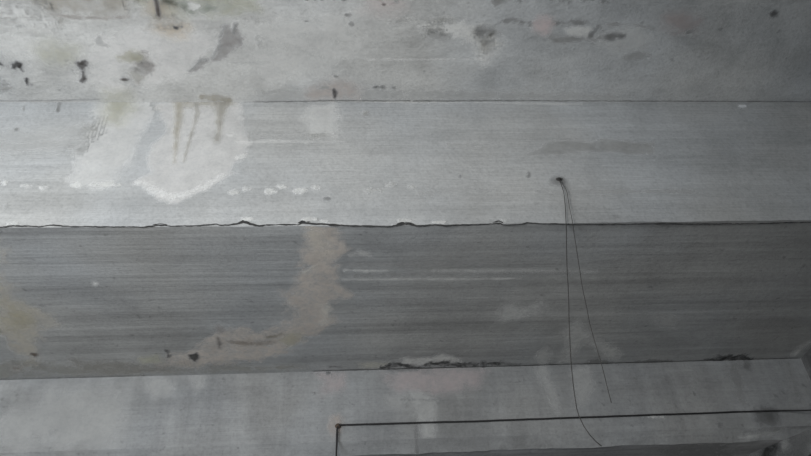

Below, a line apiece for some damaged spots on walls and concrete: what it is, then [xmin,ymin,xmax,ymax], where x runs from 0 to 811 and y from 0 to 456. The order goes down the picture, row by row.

damp [0,95,250,203]
corrosion [174,95,232,161]
crack [0,217,811,228]
spalling [365,354,520,371]